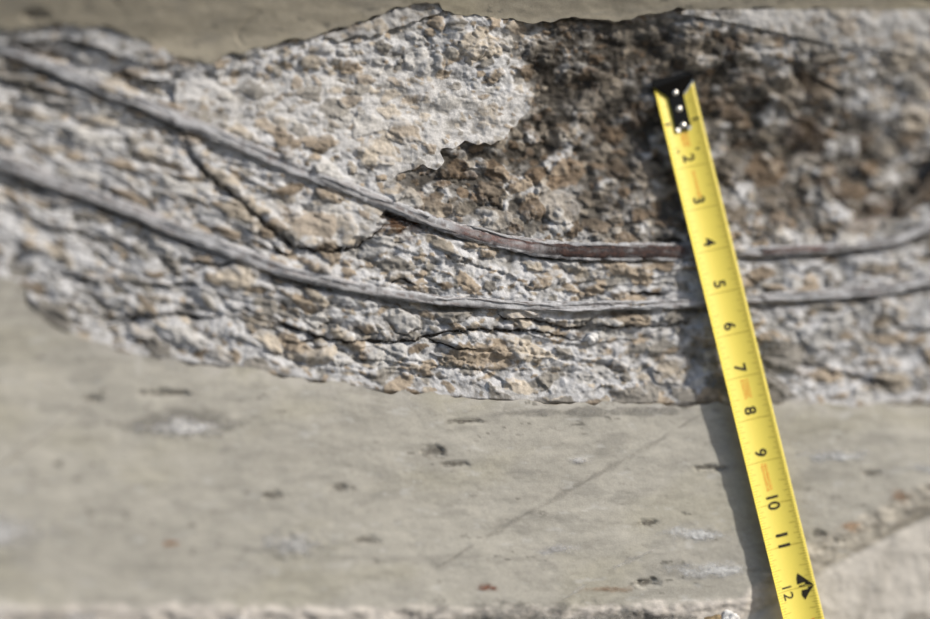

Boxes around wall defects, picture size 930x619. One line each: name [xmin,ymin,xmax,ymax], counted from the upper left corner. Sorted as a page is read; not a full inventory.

leakage [532,33,667,96]
corrosion [383,214,419,240]
spalling [0,0,930,407]
corrosion [547,242,689,260]